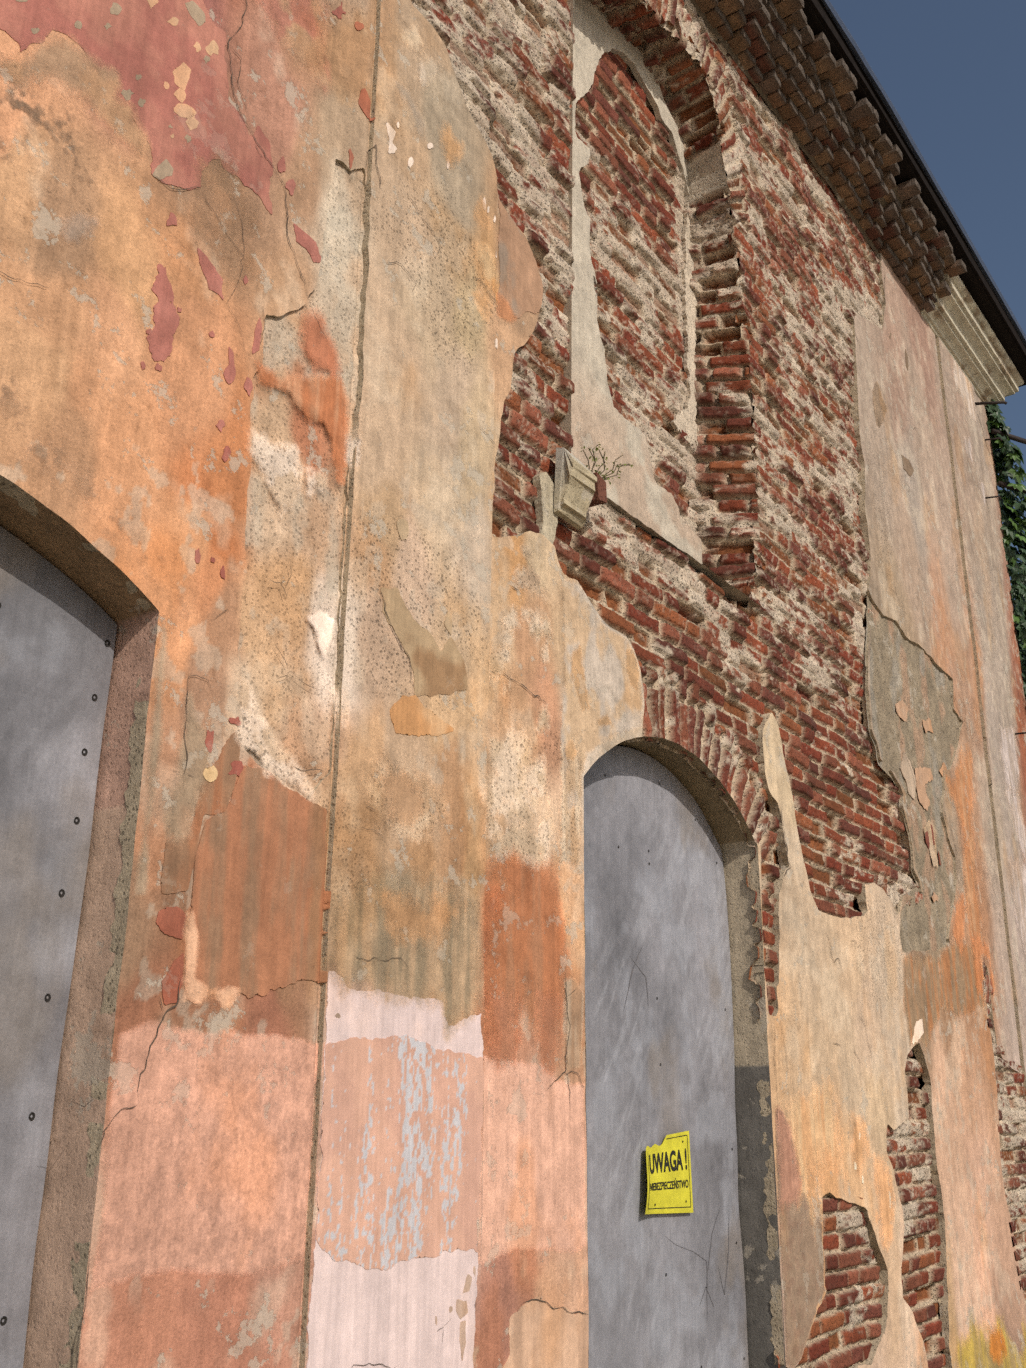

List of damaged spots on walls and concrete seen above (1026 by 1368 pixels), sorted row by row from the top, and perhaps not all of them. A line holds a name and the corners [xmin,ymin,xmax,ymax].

peeling [332,2,364,31]
peeling [0,0,296,215]
crack [228,0,330,344]
peeling [358,88,375,121]
flaking render [411,0,960,1018]
flaking render [380,587,468,737]
crack [76,1272,89,1368]
crack [73,983,180,1148]
flaking render [774,1194,885,1368]
flaking render [886,1050,946,1368]
flaking render [983,961,1026,1305]